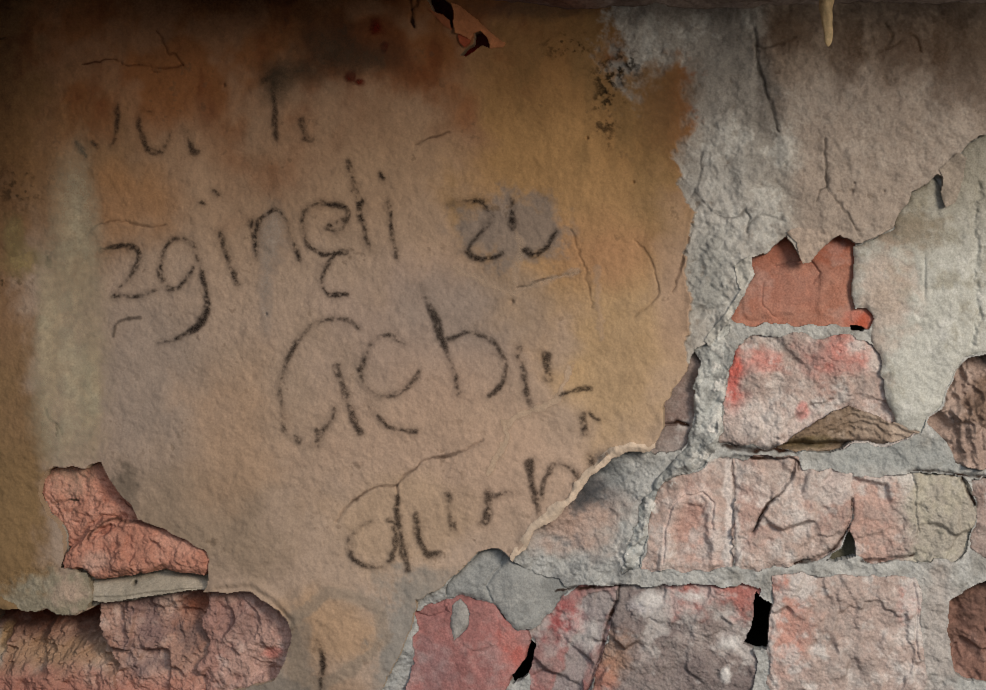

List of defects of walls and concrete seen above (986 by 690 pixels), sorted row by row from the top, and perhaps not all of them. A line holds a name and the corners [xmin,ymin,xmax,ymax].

spalling [0,462,292,690]
spalling [382,0,986,690]